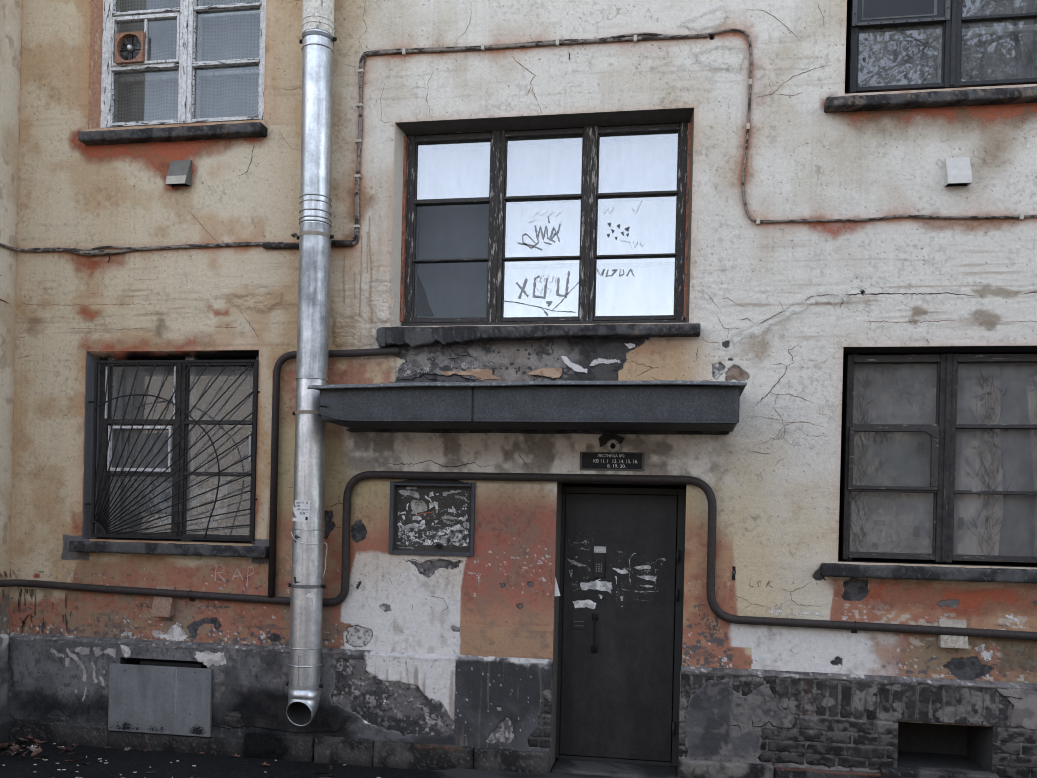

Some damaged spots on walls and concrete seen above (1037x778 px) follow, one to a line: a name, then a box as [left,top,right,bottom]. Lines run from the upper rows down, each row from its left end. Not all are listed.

corrosion [70,133,260,190]
spalling [376,337,642,383]
crack [696,292,974,381]
crack [752,345,823,467]
peeling [116,603,230,641]
spalling [347,626,372,646]
spalling [412,559,461,577]
spalling [842,579,868,611]
spalling [331,659,455,737]
spalling [486,707,514,743]
spalling [528,688,552,750]
spalling [678,644,1037,778]